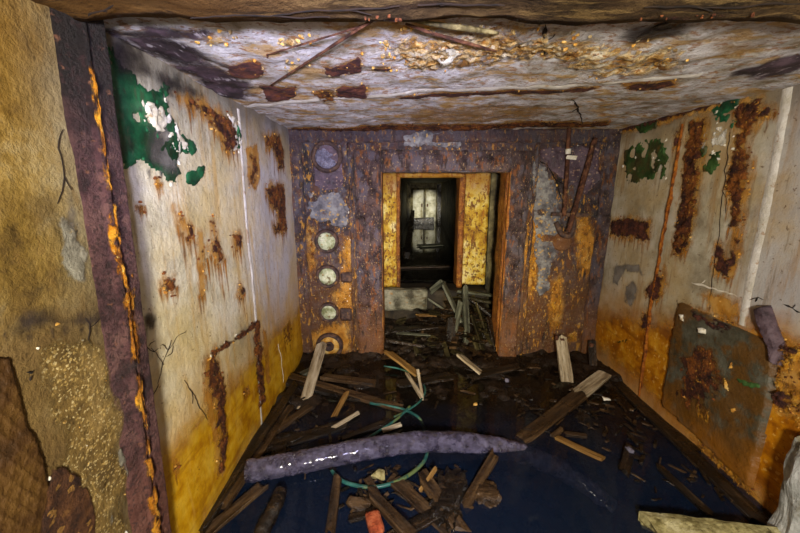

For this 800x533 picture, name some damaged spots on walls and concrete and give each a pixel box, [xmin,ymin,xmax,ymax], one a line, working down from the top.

peeling [108,46,205,187]
corrosion [177,211,246,308]
corrosion [174,91,288,240]
corrosion [228,59,297,102]
corrosion [312,52,392,102]
spalling [266,14,692,86]
peeling [622,120,669,184]
corrosion [622,103,721,396]
peeling [700,99,740,175]
corrosion [710,97,779,287]
leakage [162,309,303,533]
corrosion [203,320,271,479]